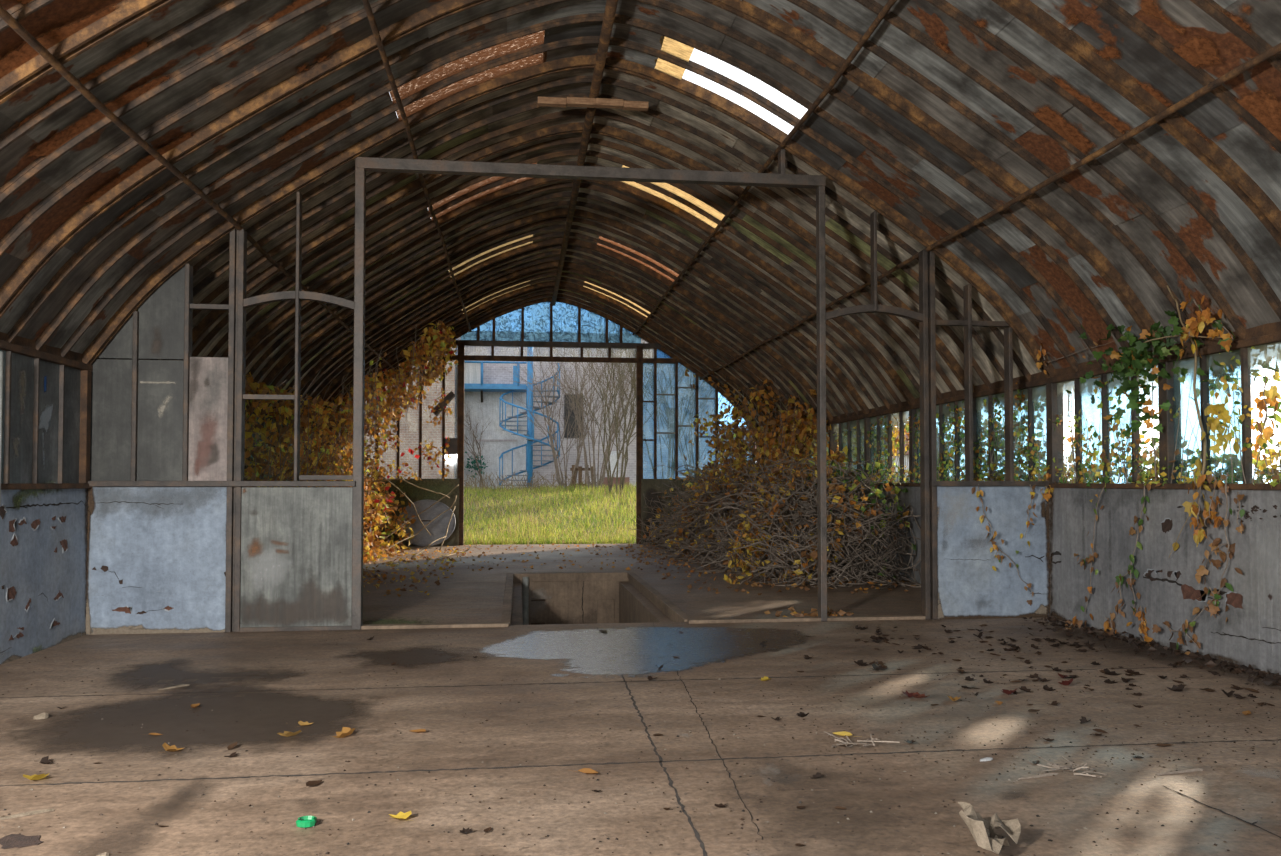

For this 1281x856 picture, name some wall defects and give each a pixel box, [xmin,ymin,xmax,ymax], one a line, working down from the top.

corrosion [1033,106,1094,154]
corrosion [1235,88,1281,151]
flaking render [0,504,68,553]
flaking render [1161,518,1173,533]
flaking render [1143,569,1208,602]
flaking render [1225,591,1243,609]
leakage [24,661,364,756]
crack [1163,785,1281,838]